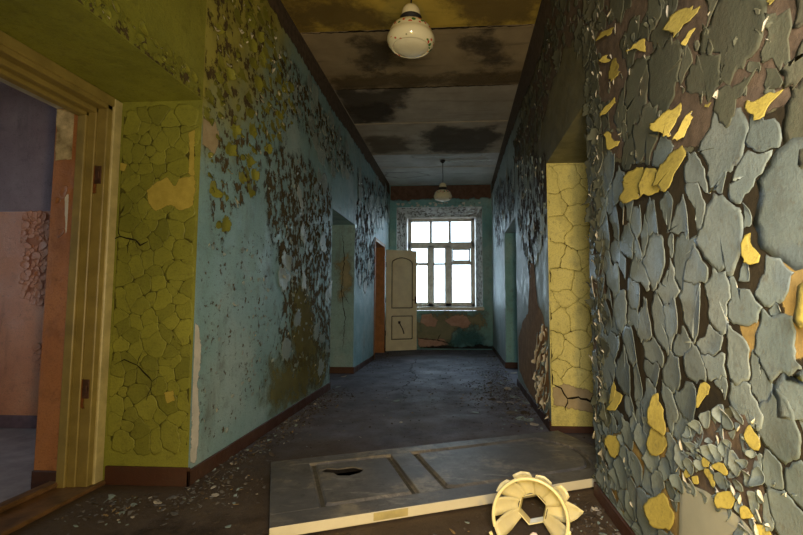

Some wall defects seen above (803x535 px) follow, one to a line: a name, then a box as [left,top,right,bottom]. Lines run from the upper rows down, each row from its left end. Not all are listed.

water stain [285,0,391,33]
water stain [331,0,541,124]
water stain [366,126,502,162]
peeling [18,185,69,307]
crack [115,229,148,253]
peeling [107,0,482,463]
peeling [491,0,803,535]
crack [114,353,163,400]